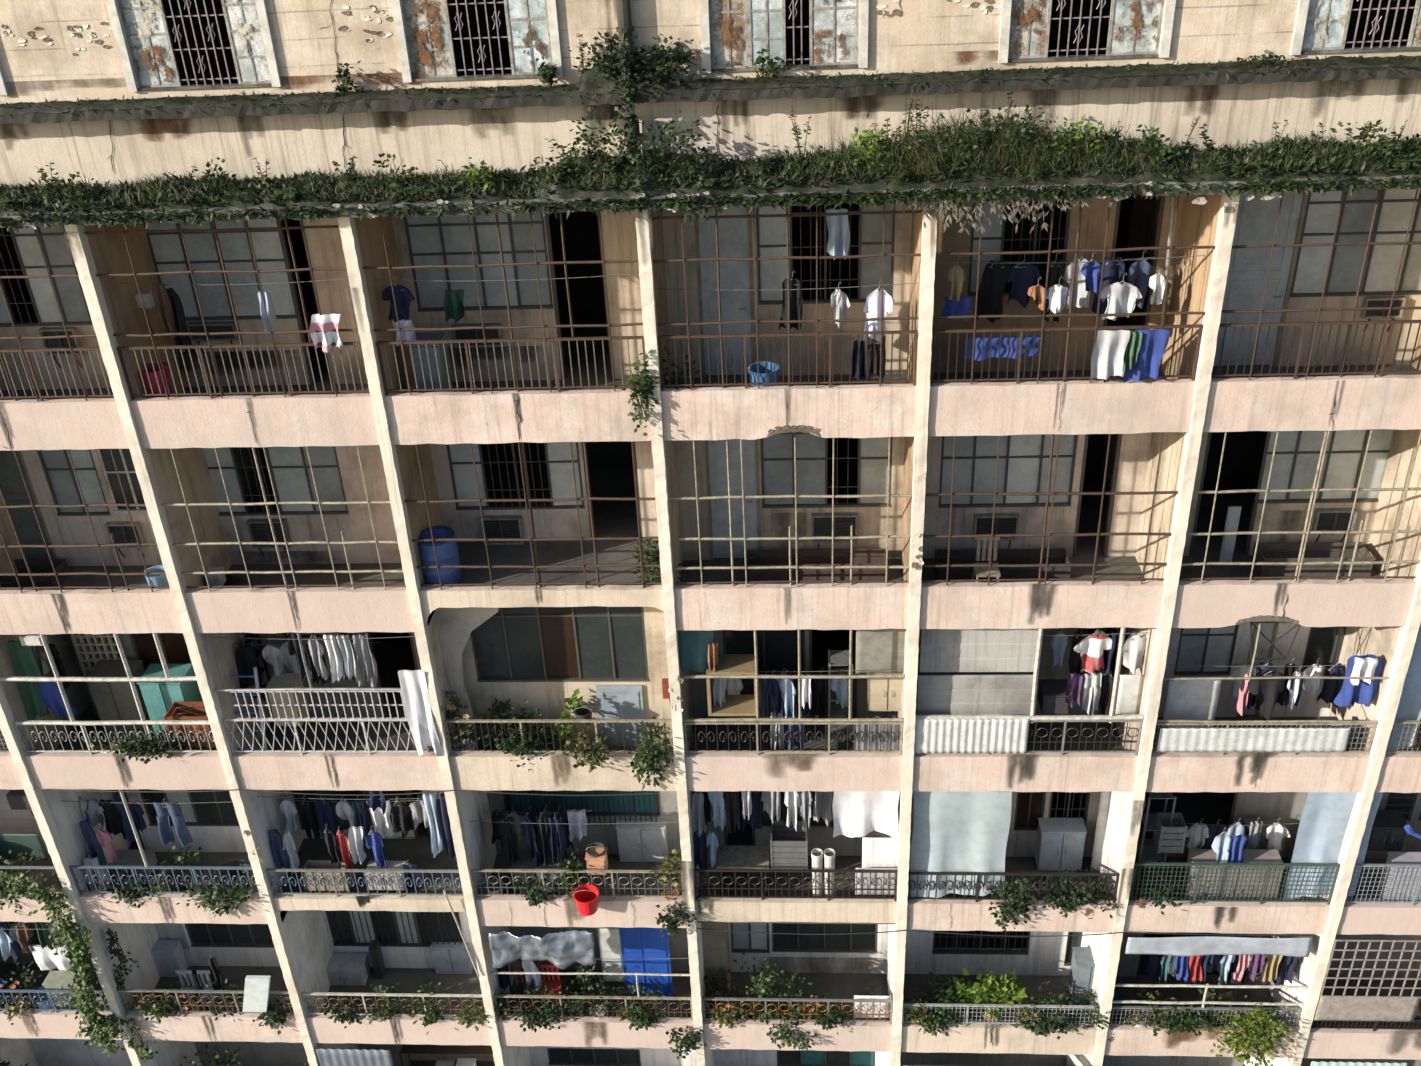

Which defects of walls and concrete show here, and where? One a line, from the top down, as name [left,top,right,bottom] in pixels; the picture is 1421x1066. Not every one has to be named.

peeling [1,0,163,56]
rust [135,44,173,83]
crack [320,0,338,69]
spalling [338,5,393,43]
rust [515,26,547,72]
rust [813,29,850,63]
spalling [876,0,902,17]
spalling [947,0,1002,15]
rust [1118,0,1158,42]
damp [1030,583,1055,619]
damp [1008,754,1035,786]
damp [1236,752,1269,784]